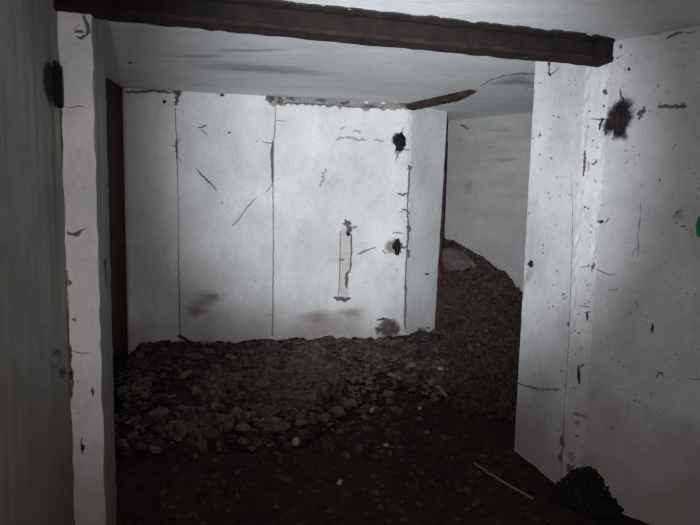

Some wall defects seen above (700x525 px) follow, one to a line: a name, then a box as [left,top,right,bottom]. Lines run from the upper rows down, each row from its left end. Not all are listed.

spalling [266,96,407,111]
spalling [617,104,650,127]
crack [126,89,216,334]
crack [233,107,285,335]
crack [397,149,412,329]